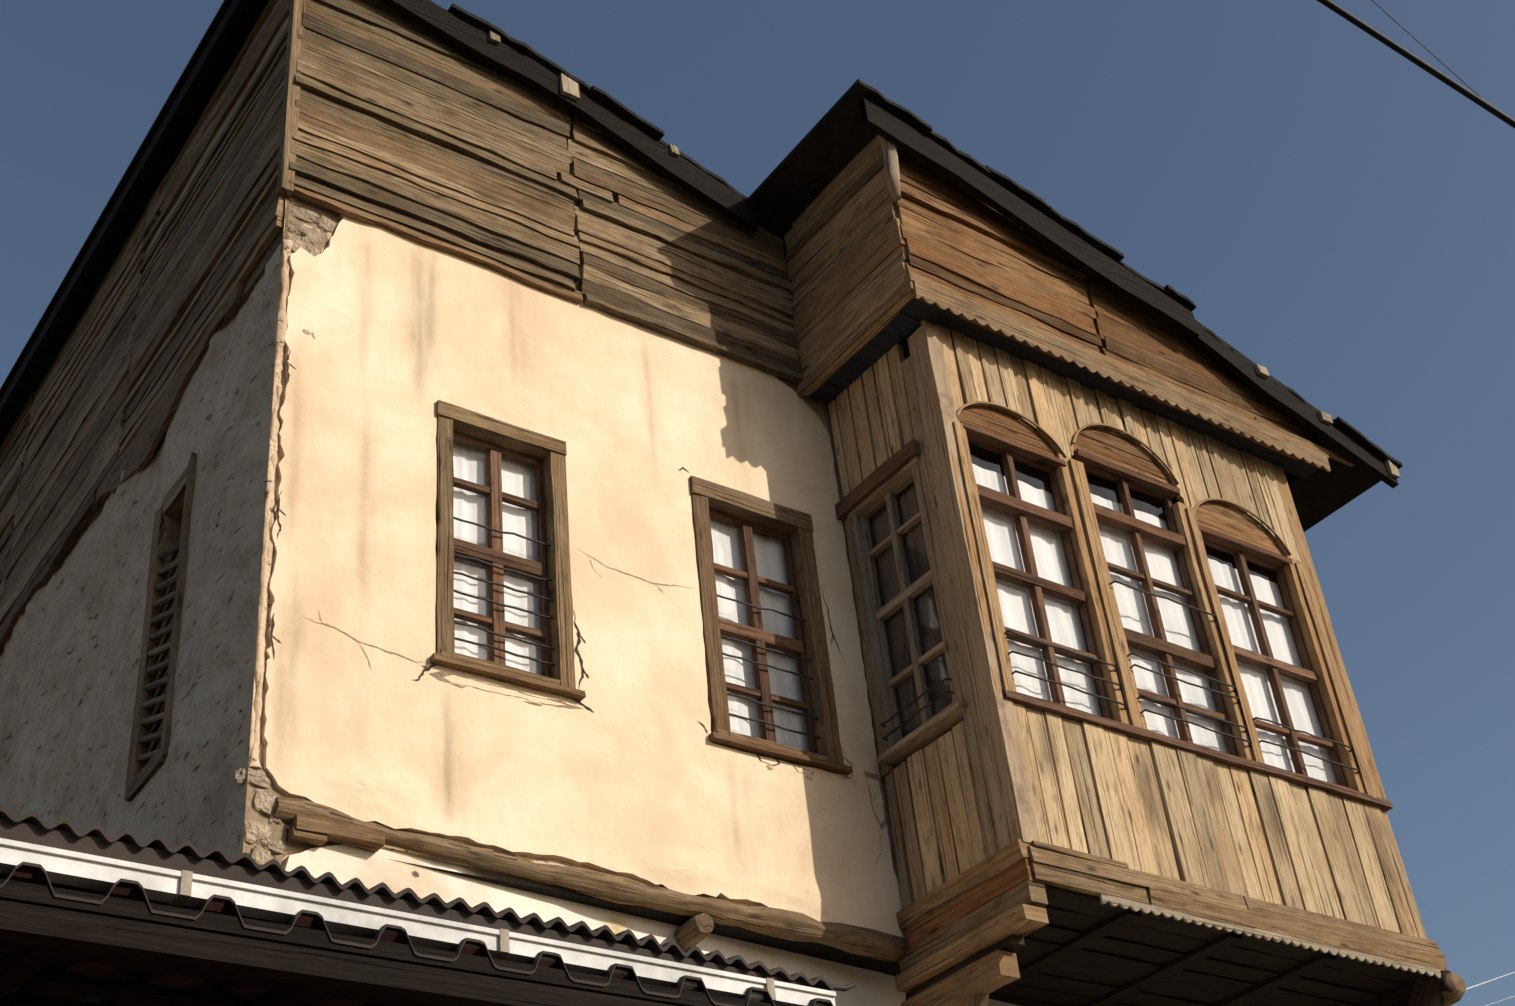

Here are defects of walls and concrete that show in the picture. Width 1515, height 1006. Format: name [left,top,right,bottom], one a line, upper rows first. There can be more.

flaking render [281,196,339,257]
crack [575,547,701,592]
crack [271,611,436,681]
flaking render [234,752,287,869]